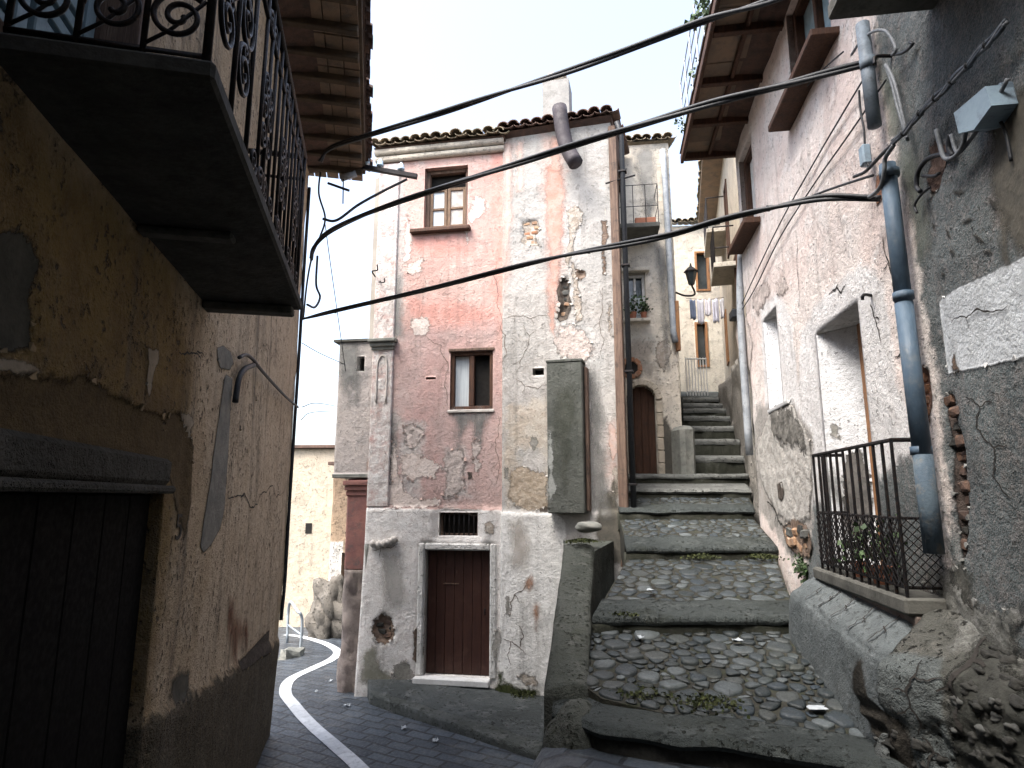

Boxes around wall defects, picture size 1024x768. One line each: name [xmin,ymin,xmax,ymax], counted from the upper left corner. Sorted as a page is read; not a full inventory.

peeling [503,137,596,361]
crack [951,302,1007,327]
peeling [0,348,195,535]
crack [228,485,279,508]
flaking render [389,423,482,509]
peeling [504,430,557,513]
peeling [757,404,813,558]
crack [966,397,1011,499]
flaking render [851,364,1024,768]
flaking render [371,613,396,646]
crack [504,578,529,664]